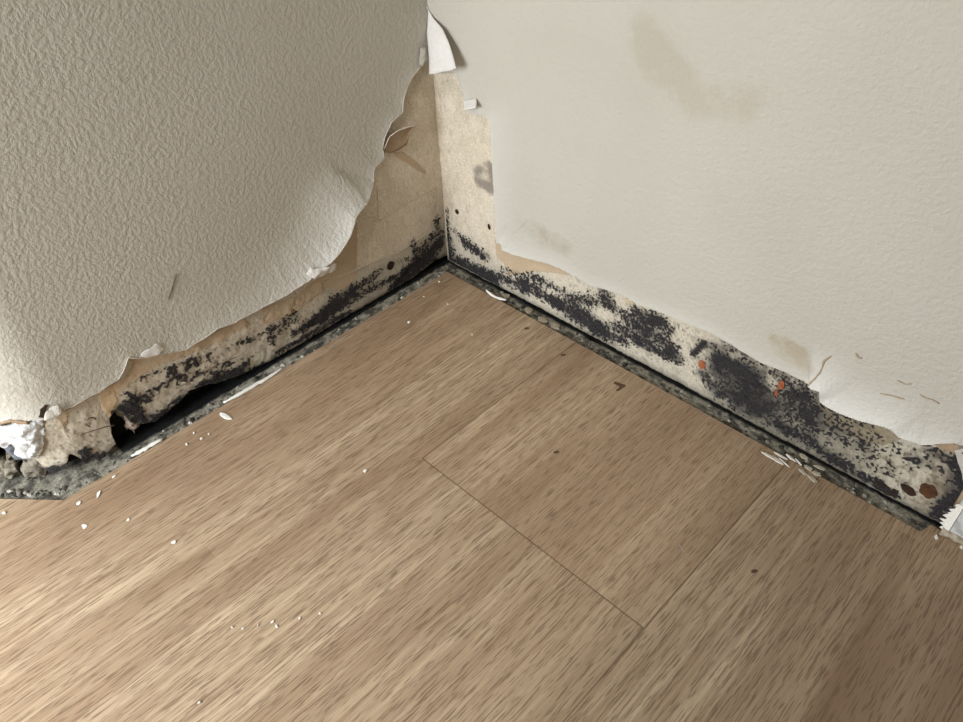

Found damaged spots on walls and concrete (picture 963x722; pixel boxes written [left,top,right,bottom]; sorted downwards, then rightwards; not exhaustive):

peeling [0,6,963,540]
water stain [111,210,963,522]